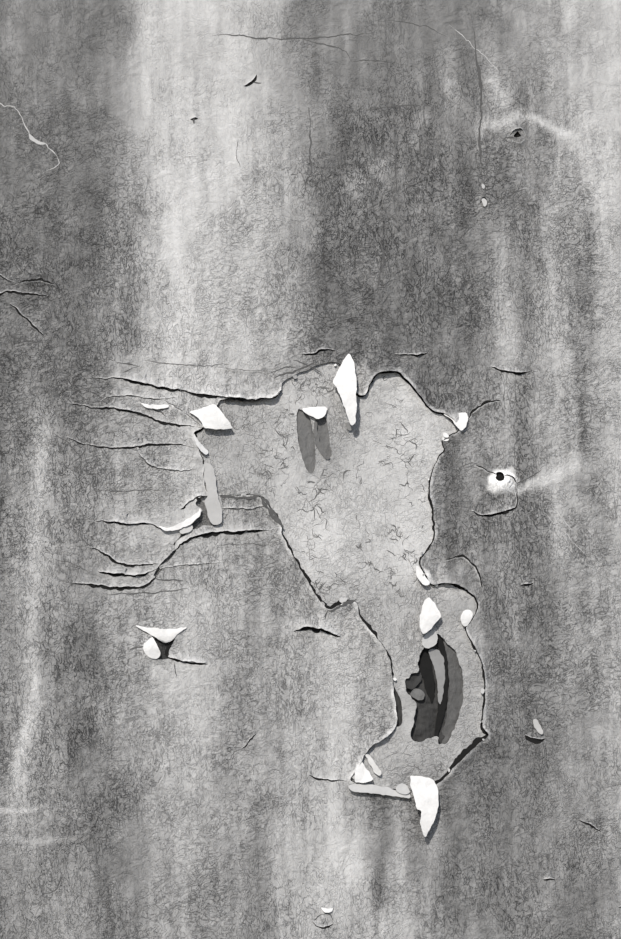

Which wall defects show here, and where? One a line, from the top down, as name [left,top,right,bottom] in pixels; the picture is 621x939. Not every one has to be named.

crack [190,111,199,123]
crack [243,74,261,87]
crack [304,107,322,193]
crack [0,246,55,349]
crack [34,342,338,595]
damp [275,0,621,939]
peeling [136,625,186,659]
peeling [159,354,488,843]